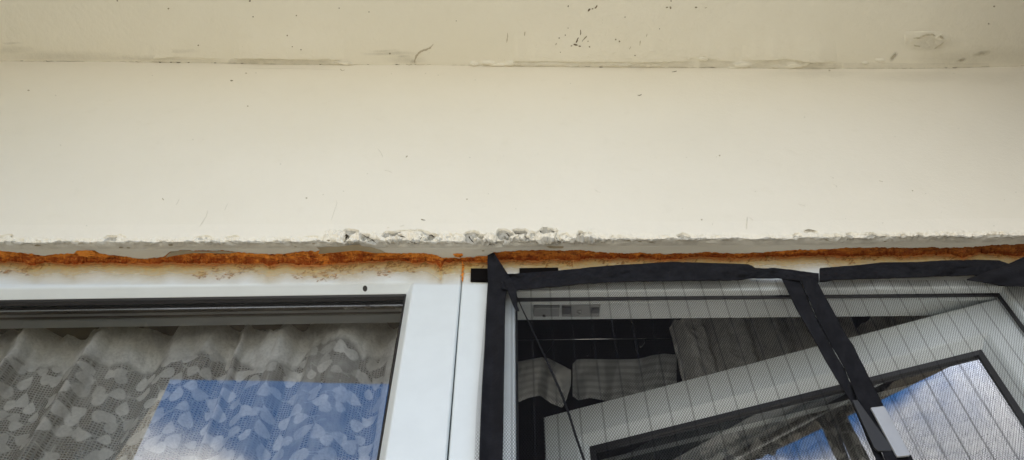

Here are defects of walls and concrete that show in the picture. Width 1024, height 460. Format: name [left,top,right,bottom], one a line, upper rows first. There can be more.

peeling [0,218,1024,257]
rust [0,244,1024,282]